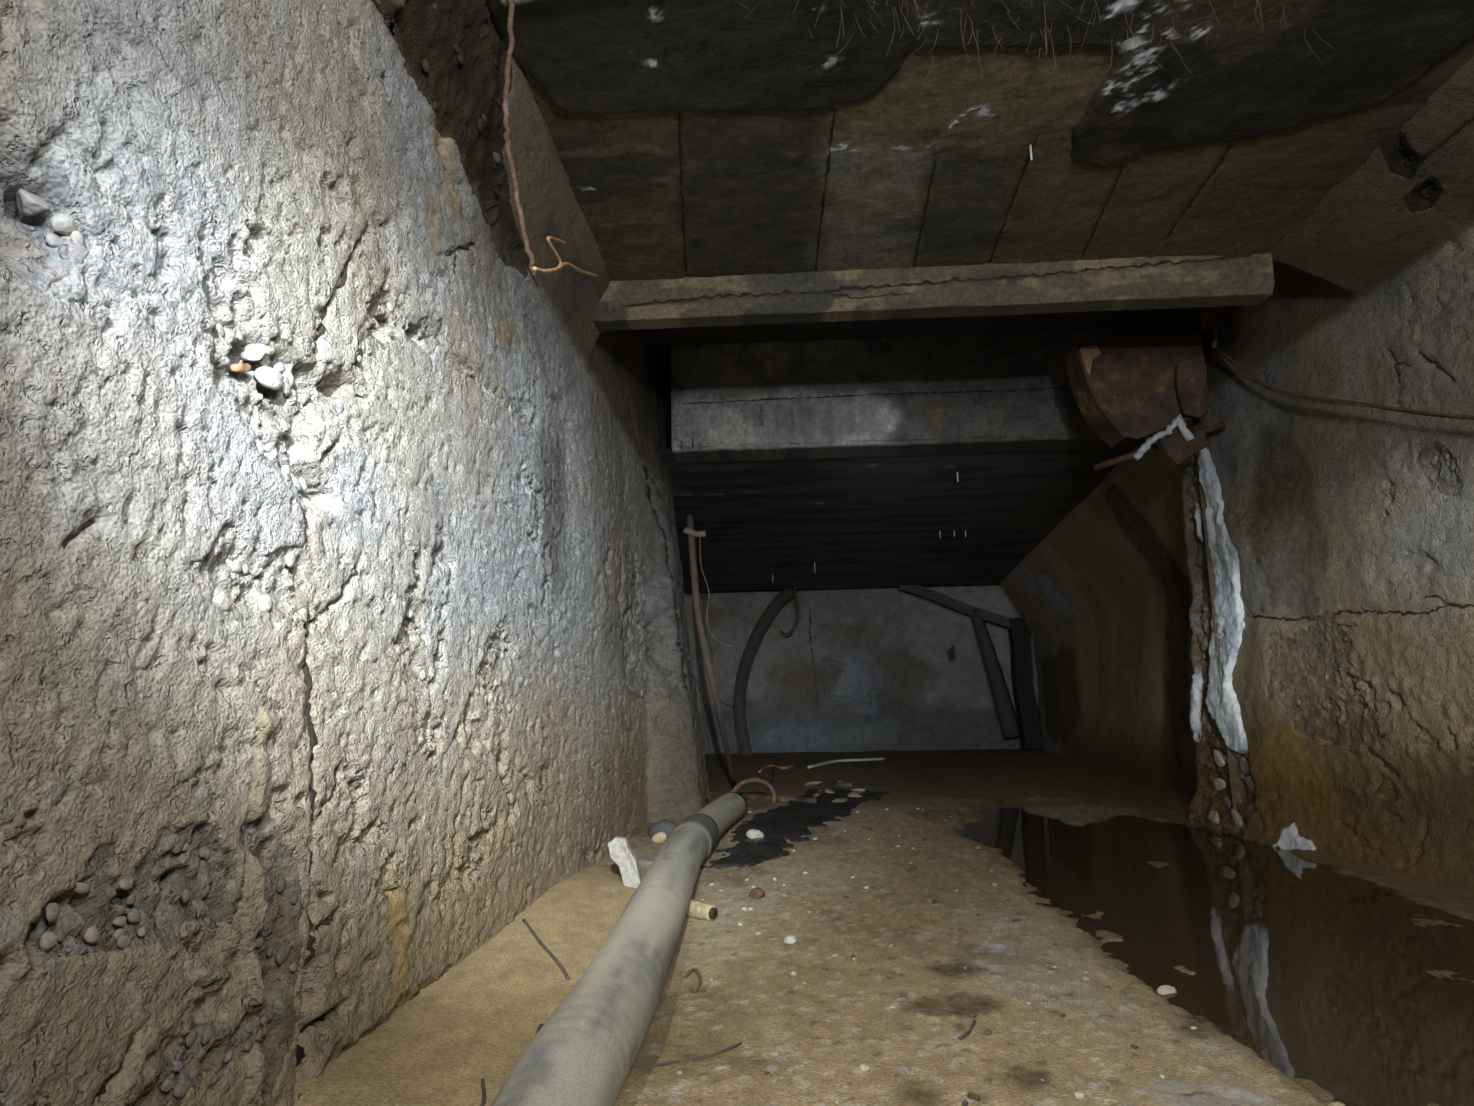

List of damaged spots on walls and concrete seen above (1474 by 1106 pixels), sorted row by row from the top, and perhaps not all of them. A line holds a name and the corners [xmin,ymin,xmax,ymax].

leakage [1106,0,1136,18]
leakage [1104,29,1172,111]
crack [313,222,369,353]
crack [301,509,309,543]
leakage [1106,414,1249,754]
crack [1253,595,1474,627]
crack [302,555,360,964]
crack [295,1008,334,1067]